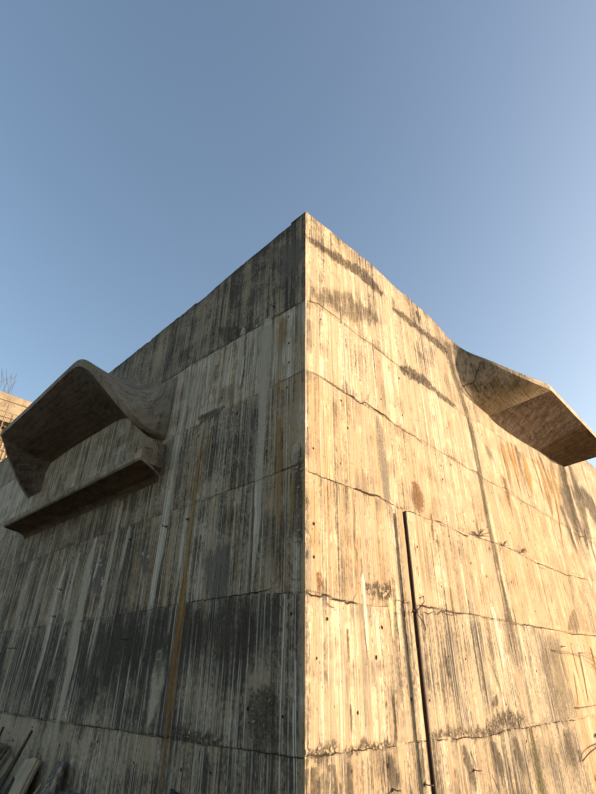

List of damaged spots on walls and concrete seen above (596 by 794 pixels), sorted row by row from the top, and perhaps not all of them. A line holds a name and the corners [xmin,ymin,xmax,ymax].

water stain [278,234,383,326]
water stain [33,318,273,746]
corrosion [412,482,425,512]
water stain [558,463,596,587]
corrosion [159,428,212,794]